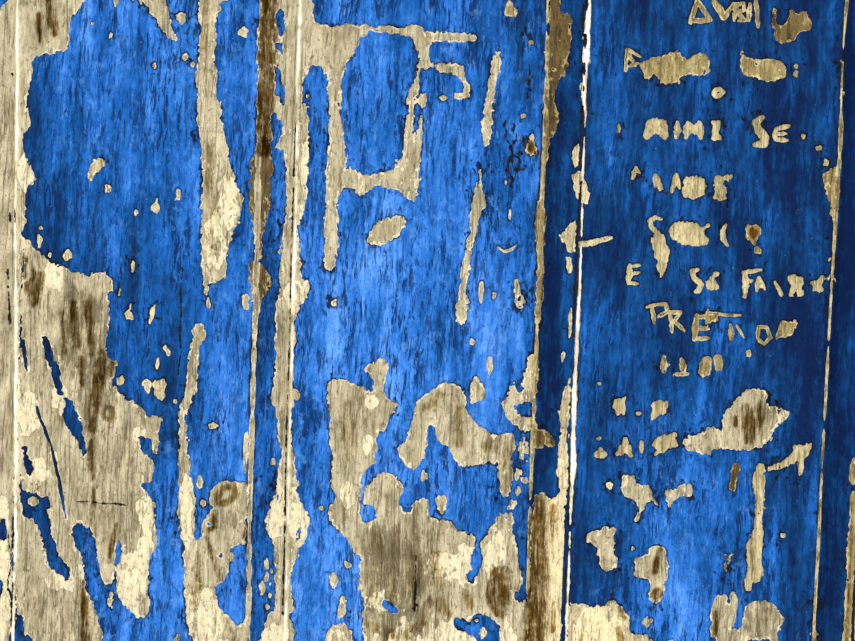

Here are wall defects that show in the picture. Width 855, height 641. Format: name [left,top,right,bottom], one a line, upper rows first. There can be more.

peeling [133,0,186,41]
peeling [481,51,502,147]
peeling [455,169,496,325]
peeling [559,221,613,273]
peeling [0,0,163,641]
peeling [182,0,477,641]
peeling [683,388,789,455]
peeling [142,323,249,641]
peeling [318,354,653,641]
peeling [606,475,692,522]
peeling [631,546,669,604]
peeling [710,592,785,641]